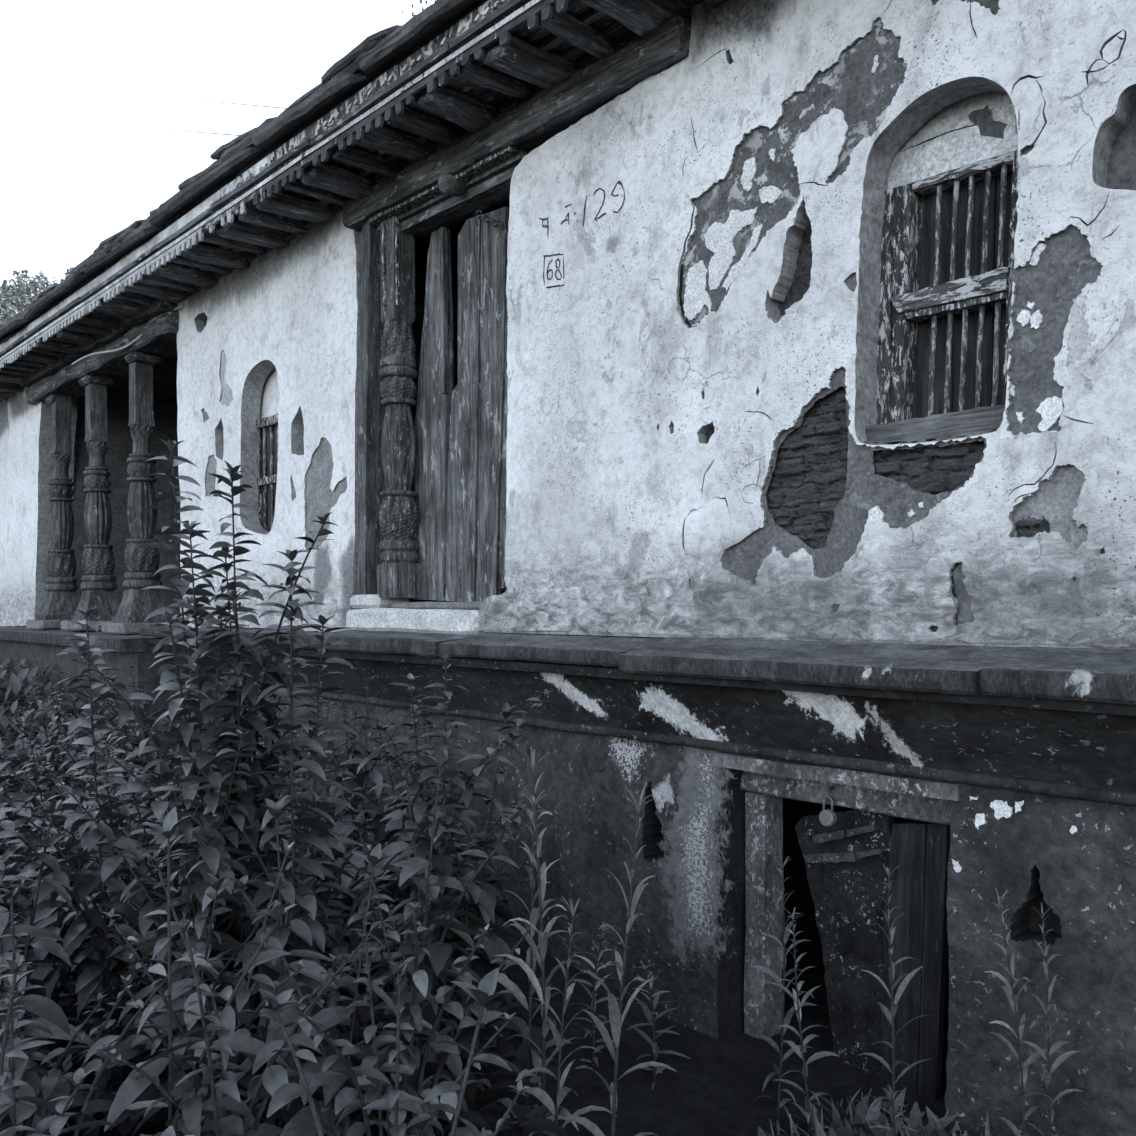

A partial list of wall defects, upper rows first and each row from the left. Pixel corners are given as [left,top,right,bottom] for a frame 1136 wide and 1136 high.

flaking render [961,0,1000,15]
flaking render [681,18,907,327]
flaking render [1004,225,1103,435]
flaking render [291,438,347,549]
flaking render [722,367,987,585]
flaking render [952,563,975,625]
flaking render [1011,465,1088,548]
damp [632,682,736,965]